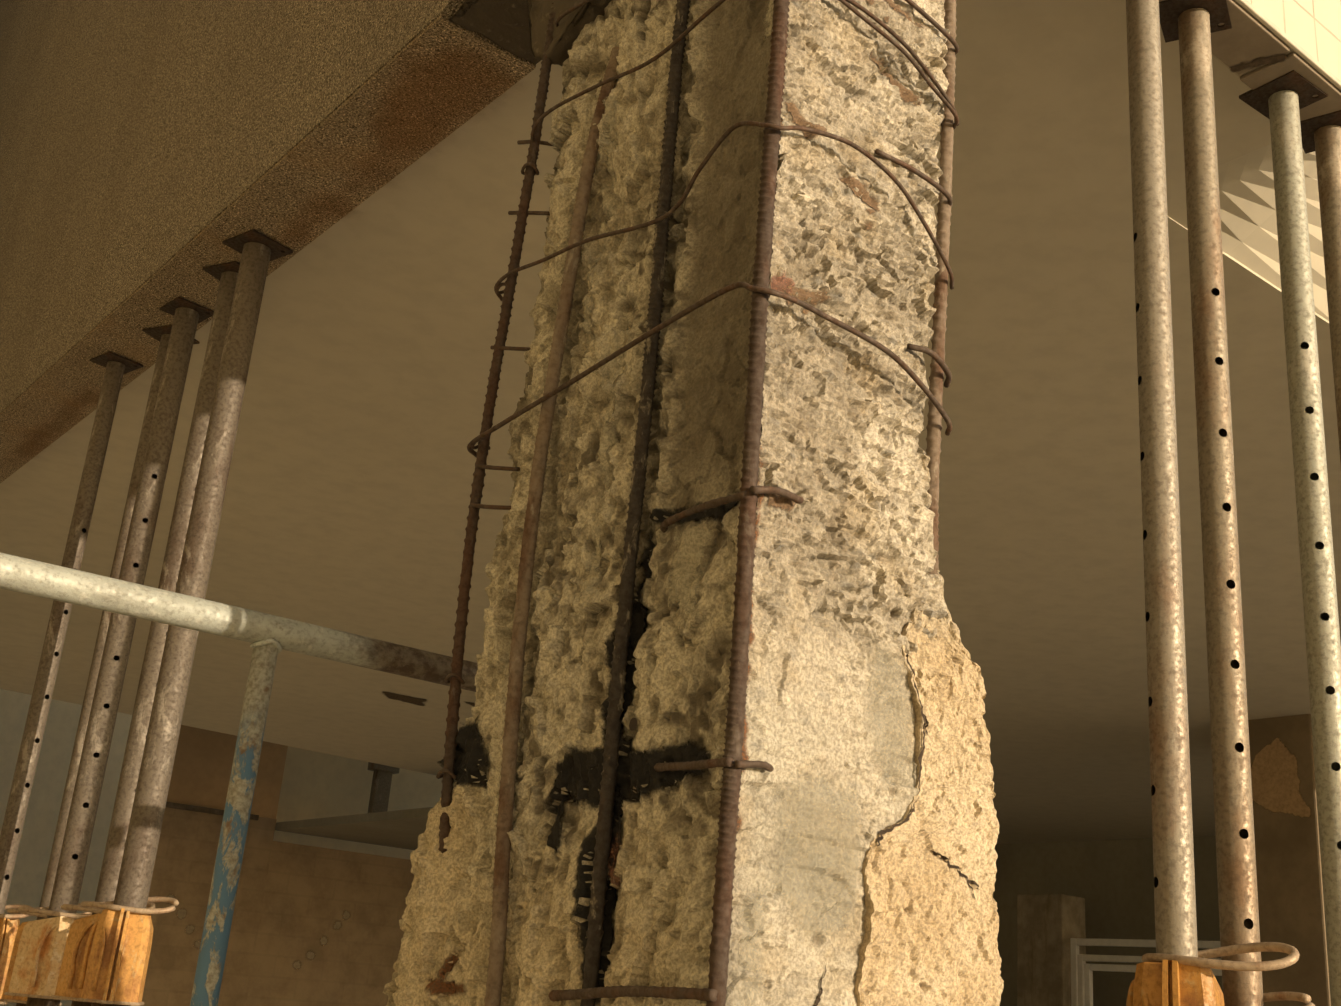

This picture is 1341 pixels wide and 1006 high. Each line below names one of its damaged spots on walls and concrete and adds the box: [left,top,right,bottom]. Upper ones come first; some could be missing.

spalling [870,54,922,105]
spalling [781,102,827,139]
spalling [840,176,880,230]
spalling [650,501,738,524]
spalling [767,494,796,511]
spalling [383,691,427,706]
leakage [438,716,490,788]
crack [877,648,929,846]
peeling [1251,738,1311,818]
crack [932,851,979,900]
rust [425,953,465,996]